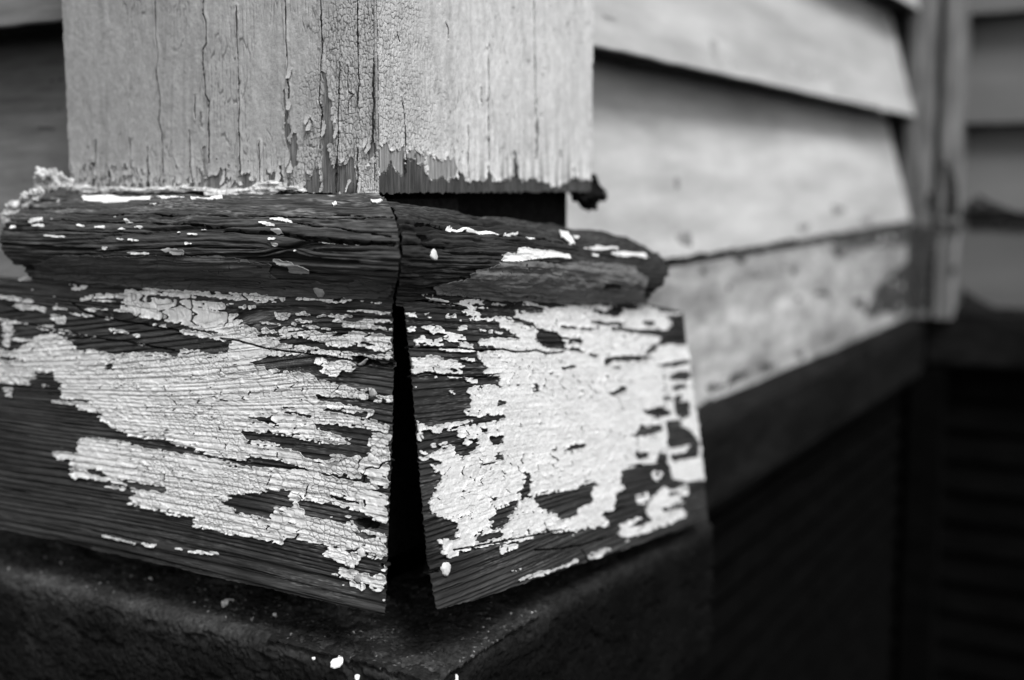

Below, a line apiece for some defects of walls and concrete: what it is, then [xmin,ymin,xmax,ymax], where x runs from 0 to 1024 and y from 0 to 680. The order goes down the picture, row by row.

crack [18,0,448,249]
peeling [70,67,591,206]
crack [499,235,579,248]
peeling [0,216,393,601]
peeling [405,235,776,558]
peeling [511,548,611,582]